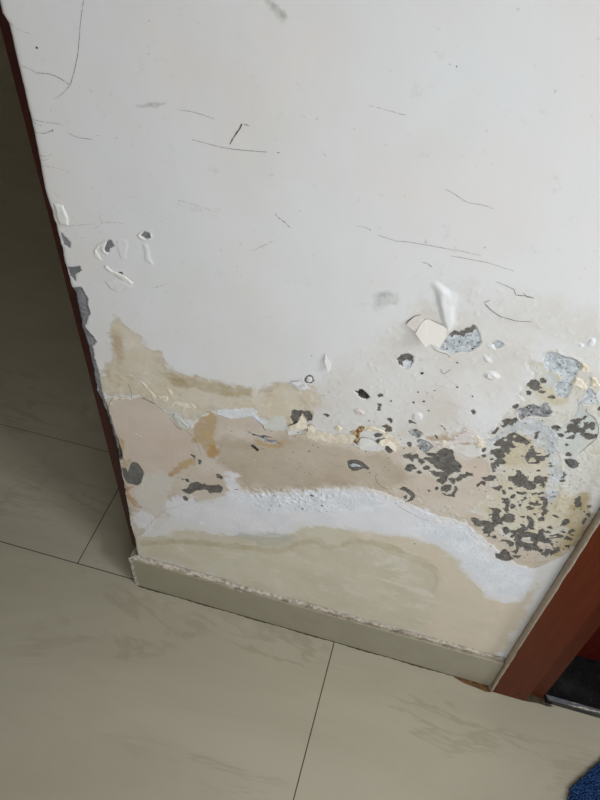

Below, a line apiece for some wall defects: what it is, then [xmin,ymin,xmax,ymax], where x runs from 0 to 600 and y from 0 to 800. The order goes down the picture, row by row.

peeling [93,240,114,261]
peeling [137,231,153,242]
flaking render [68,266,600,568]
damp [96,236,600,454]
damp [129,463,549,657]
damp [543,485,600,562]